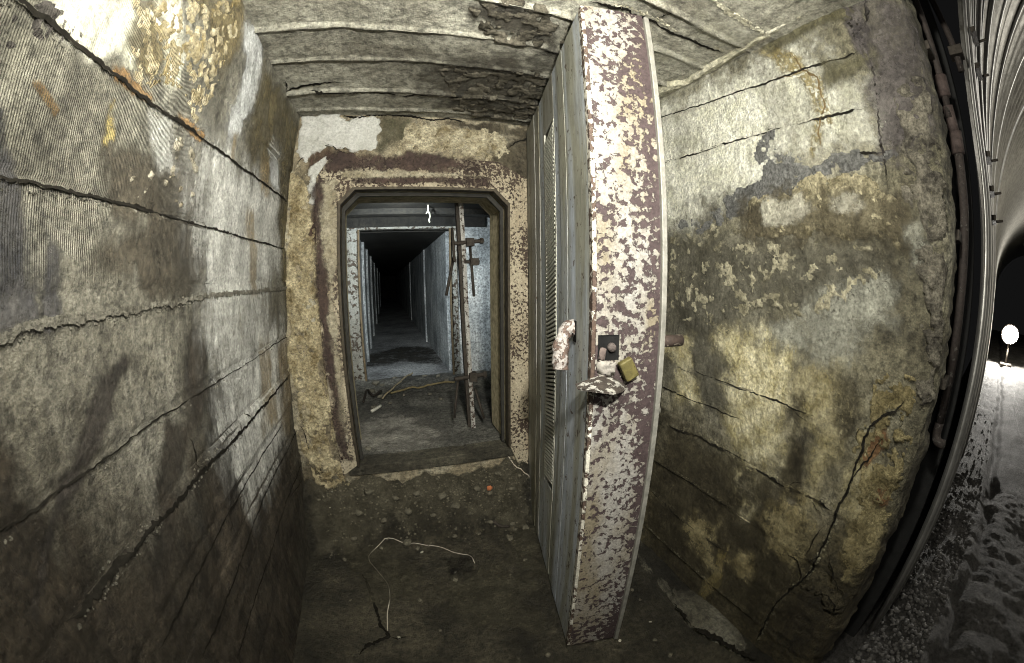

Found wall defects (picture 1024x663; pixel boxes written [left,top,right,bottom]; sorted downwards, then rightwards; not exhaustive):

crack [0,0,287,202]
peeling [468,0,571,48]
crack [661,0,888,186]
rust [761,47,833,155]
crack [0,337,287,545]
crack [0,175,305,254]
crack [67,376,326,659]
rust [309,150,491,461]
crack [663,371,813,421]
crack [648,399,907,661]
leakage [648,0,935,633]